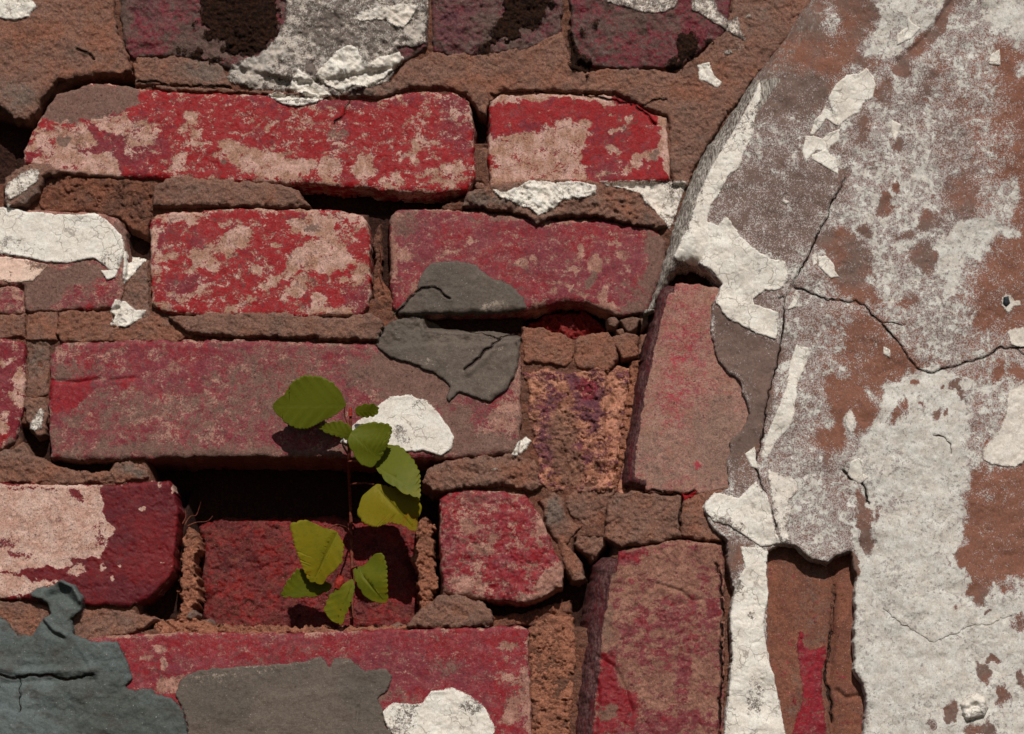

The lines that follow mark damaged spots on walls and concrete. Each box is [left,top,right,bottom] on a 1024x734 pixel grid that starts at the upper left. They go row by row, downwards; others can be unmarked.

peeling [354,3,420,28]
peeling [691,0,752,41]
peeling [267,45,404,107]
peeling [697,62,722,88]
peeling [802,68,876,174]
peeling [674,82,798,339]
peeling [811,253,839,278]
peeling [1001,295,1021,314]
crack [755,181,1024,529]
peeling [1008,327,1024,347]
peeling [982,384,1024,467]
peeling [703,344,809,734]